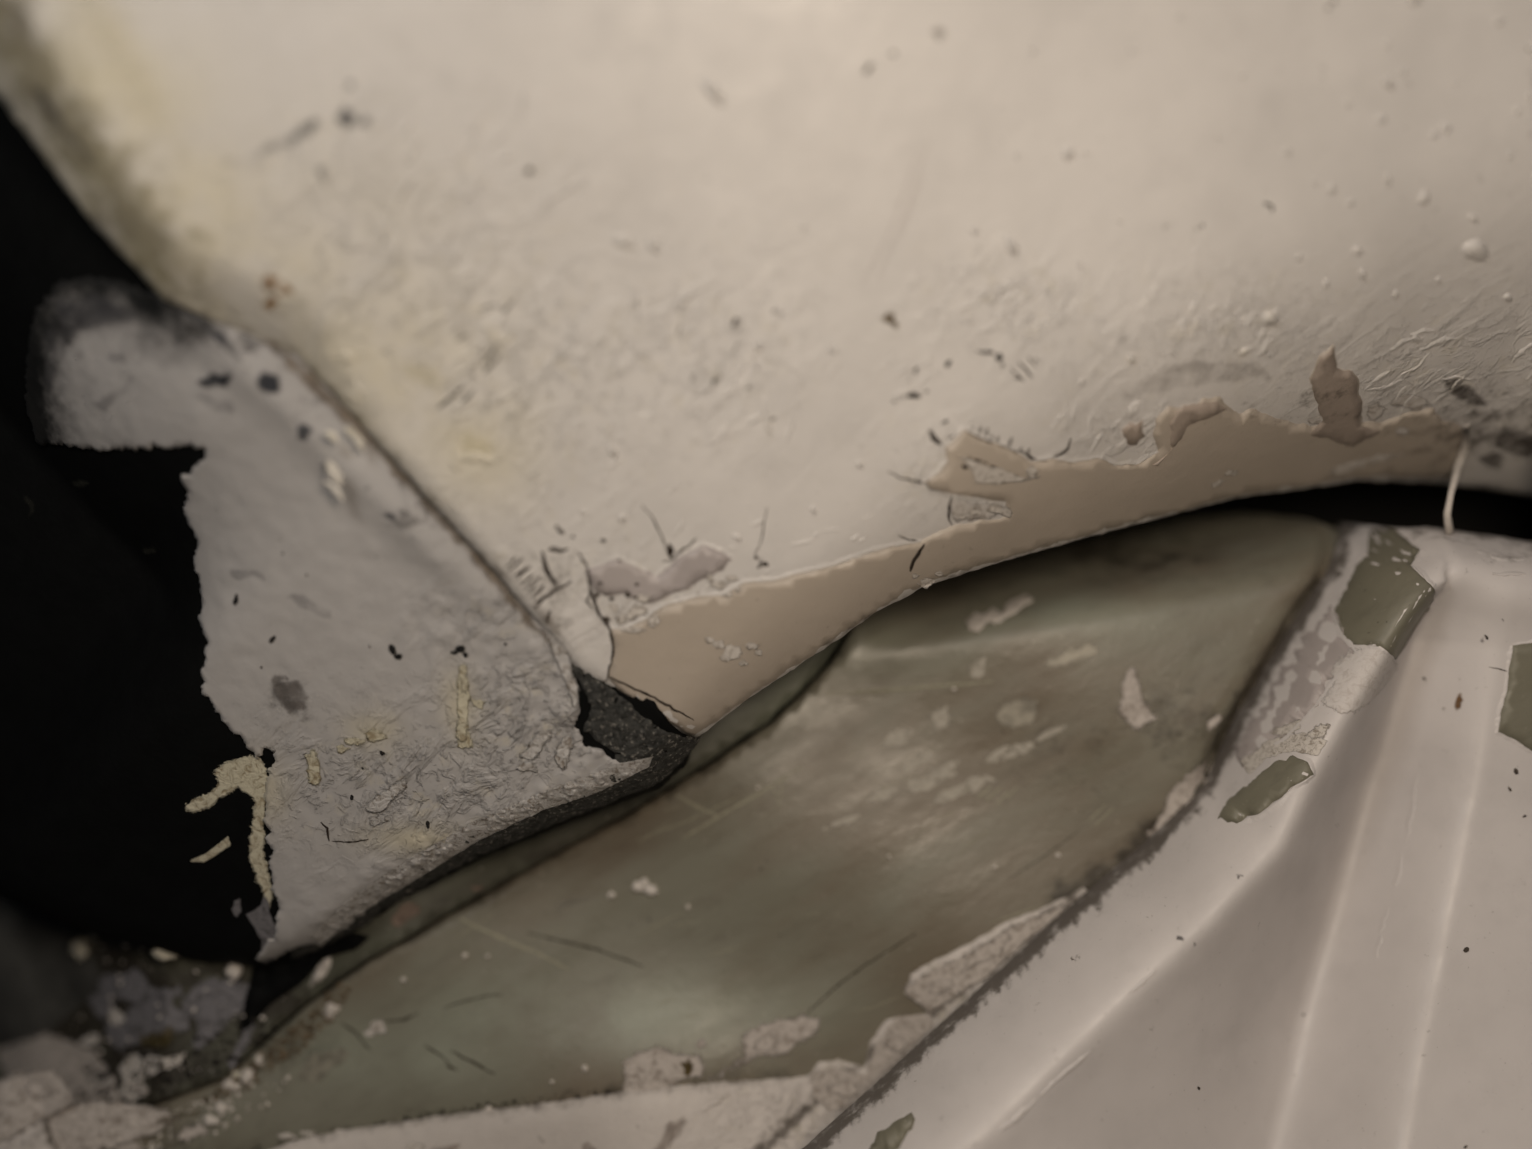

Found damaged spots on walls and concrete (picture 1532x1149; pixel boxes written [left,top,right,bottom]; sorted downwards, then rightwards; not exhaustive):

peeling [581,345,1464,736]
peeling [450,645,468,658]
peeling [1214,528,1438,825]
peeling [1494,639,1532,754]
peeling [516,729,576,773]
peeling [190,836,231,863]
peeling [231,899,242,917]
peeling [150,949,179,961]
peeling [78,990,125,1048]
peeling [708,1013,822,1082]
peeling [175,1024,264,1141]